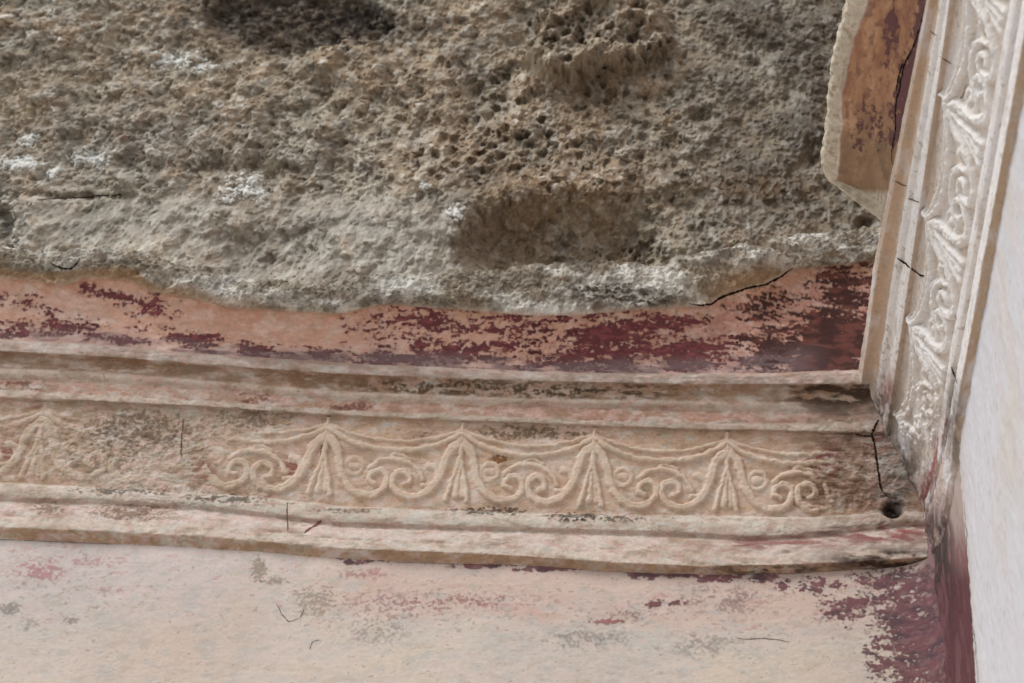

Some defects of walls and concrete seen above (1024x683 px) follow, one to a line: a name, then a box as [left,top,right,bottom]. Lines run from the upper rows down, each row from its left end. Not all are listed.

crack [891,4,951,203]
flaking render [0,0,926,377]
crack [689,268,794,307]
crack [855,413,888,497]
peeling [451,563,576,572]
peeling [627,564,947,683]